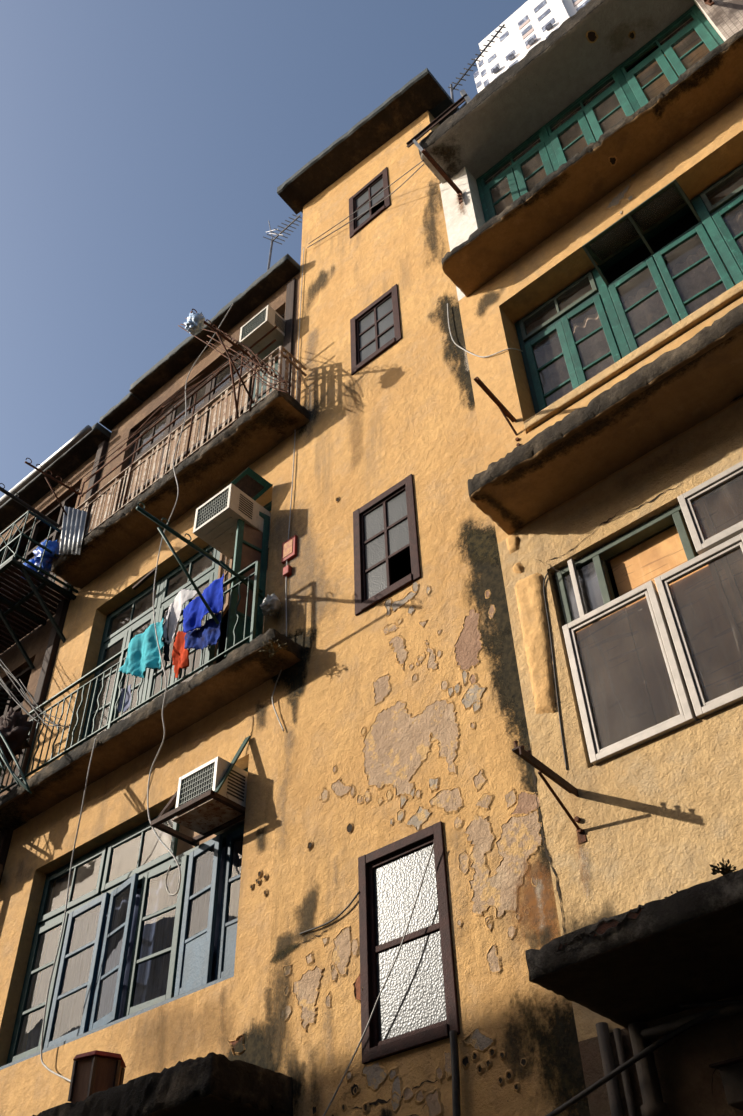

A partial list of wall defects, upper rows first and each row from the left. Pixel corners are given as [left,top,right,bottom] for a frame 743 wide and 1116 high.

leakage [653,36,743,117]
leakage [431,143,461,178]
leakage [423,181,443,259]
leakage [477,289,502,316]
leakage [428,296,475,410]
crack [536,482,684,573]
leakage [460,331,741,877]
leakage [227,627,317,726]
peeling [319,581,543,975]
spalling [556,905,648,952]
leakage [227,889,333,1114]